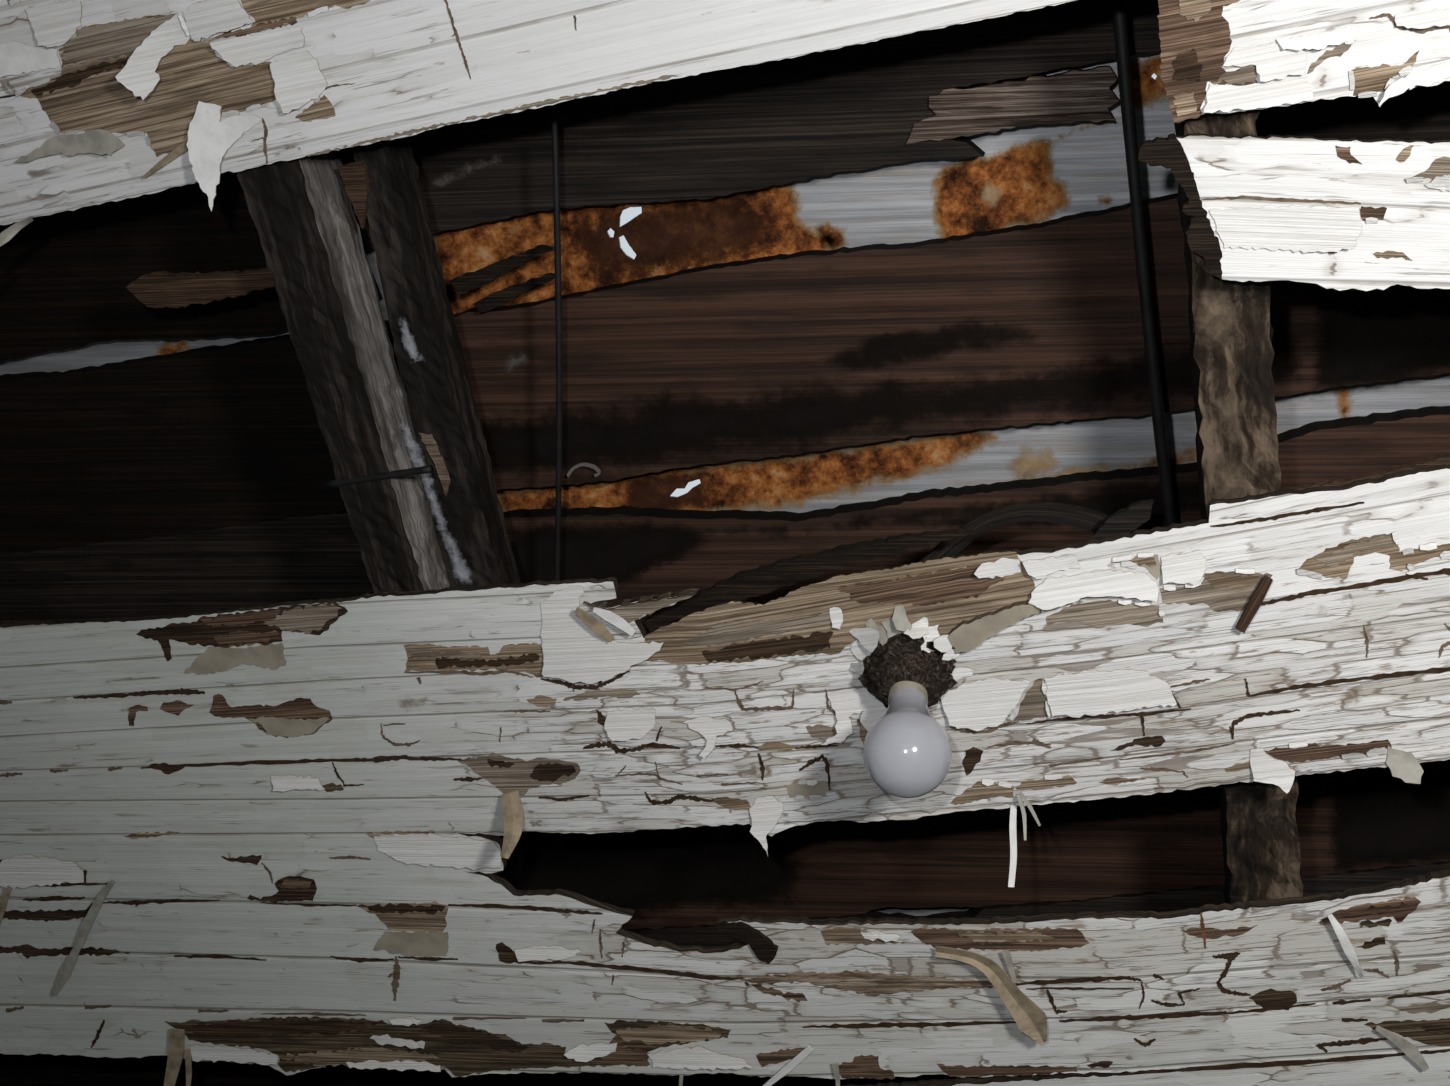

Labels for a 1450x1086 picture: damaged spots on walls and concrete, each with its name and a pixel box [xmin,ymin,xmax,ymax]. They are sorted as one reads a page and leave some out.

peeling [0,0,370,163]
peeling [1157,0,1257,123]
peeling [1276,26,1450,106]
corrosion [935,141,1067,238]
corrosion [433,184,844,314]
corrosion [499,431,995,512]
peeling [645,551,1272,665]
crack [1261,568,1450,605]
crack [950,623,1450,778]
peeling [165,1016,805,1077]
crack [803,1021,1016,1029]
crack [1015,912,1450,1076]